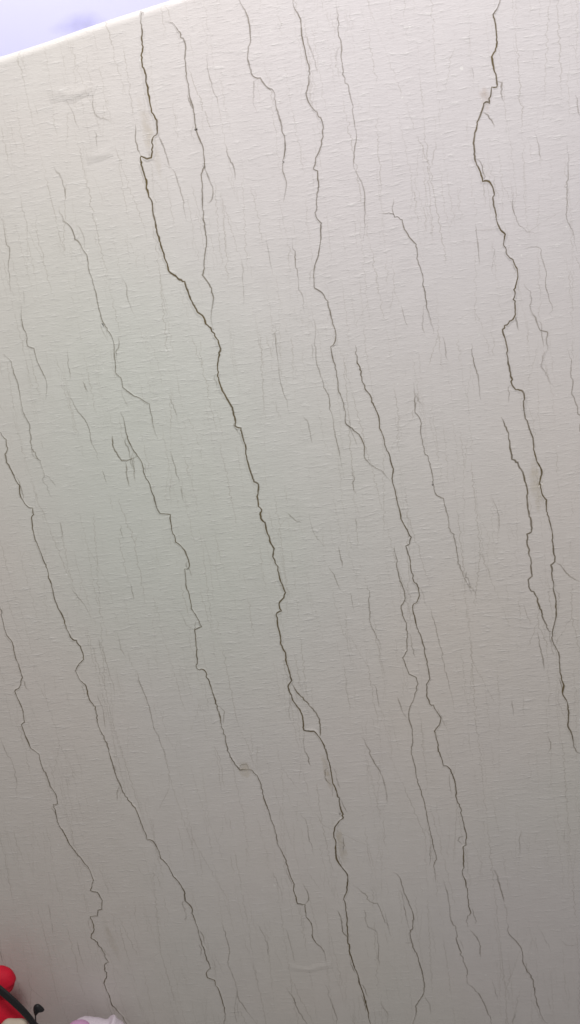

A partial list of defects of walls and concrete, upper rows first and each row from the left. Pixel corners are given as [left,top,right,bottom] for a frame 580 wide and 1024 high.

crack [0,304,227,1024]
crack [59,1,372,1024]
crack [292,0,473,950]
crack [392,871,426,1024]
crack [470,0,580,754]
crack [506,922,548,1024]